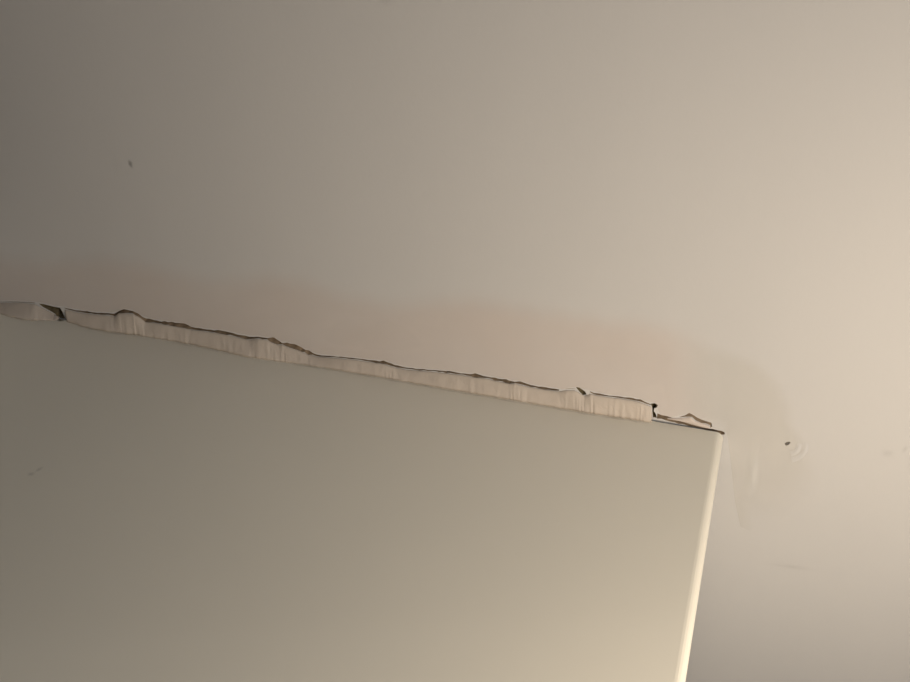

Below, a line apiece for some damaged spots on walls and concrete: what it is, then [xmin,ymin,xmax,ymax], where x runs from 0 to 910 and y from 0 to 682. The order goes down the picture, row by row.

spalling [40,304,65,321]
crack [65,308,725,435]